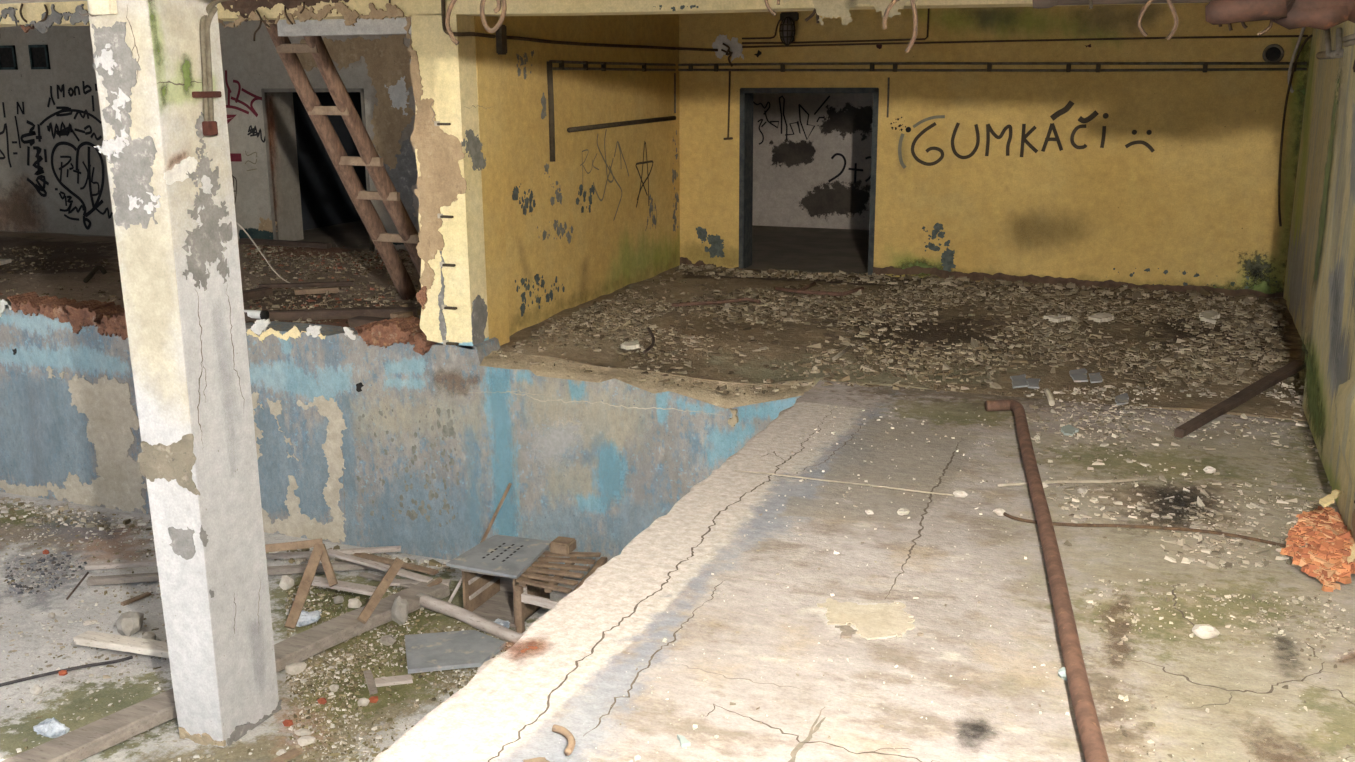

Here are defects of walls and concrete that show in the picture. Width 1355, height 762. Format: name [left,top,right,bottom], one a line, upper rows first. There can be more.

peeling [0,0,161,230]
spalling [218,0,486,355]
spalling [0,291,128,340]
peeling [0,366,200,514]
spalling [168,525,208,560]
peeling [252,392,347,543]
spalling [478,351,812,427]
crack [488,407,865,762]
crack [885,439,964,599]
damp [1236,250,1278,283]
crack [587,580,939,762]
crack [1125,642,1355,708]